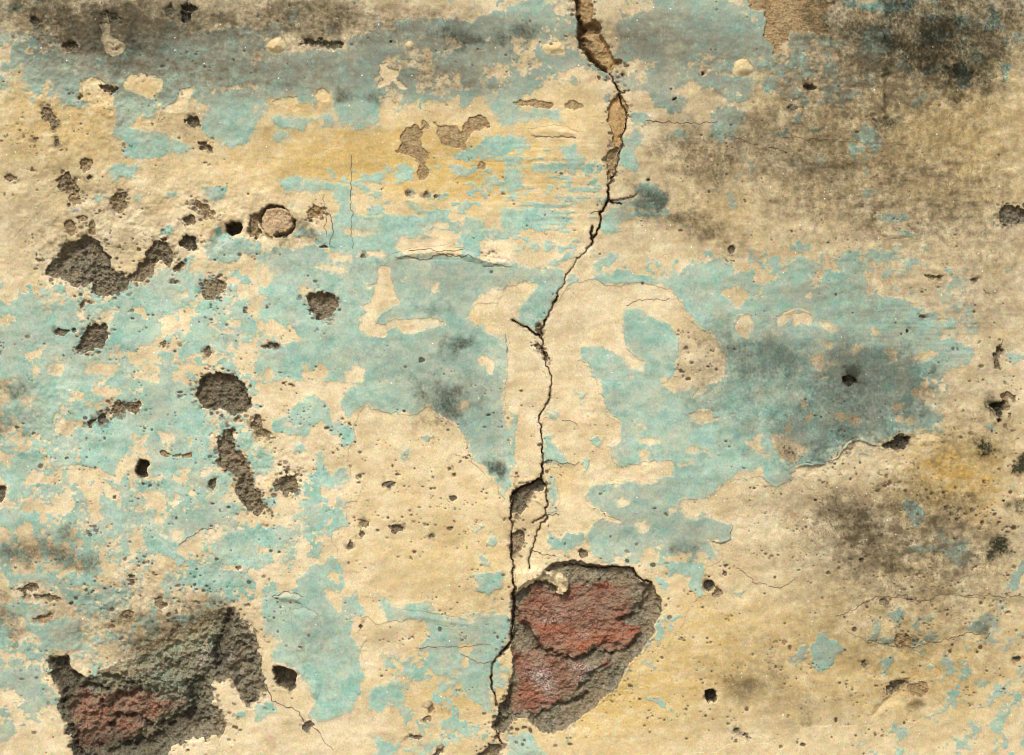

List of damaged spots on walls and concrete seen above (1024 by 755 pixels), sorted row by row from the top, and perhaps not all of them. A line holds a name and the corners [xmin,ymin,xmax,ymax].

leakage [809,0,1021,93]
peeling [395,115,490,199]
spalling [45,158,216,309]
spalling [307,291,339,320]
spalling [196,371,271,517]
peeling [331,279,944,755]
crack [419,74,908,744]
spalling [153,594,168,609]
crack [836,593,1024,616]
spalling [45,607,268,755]